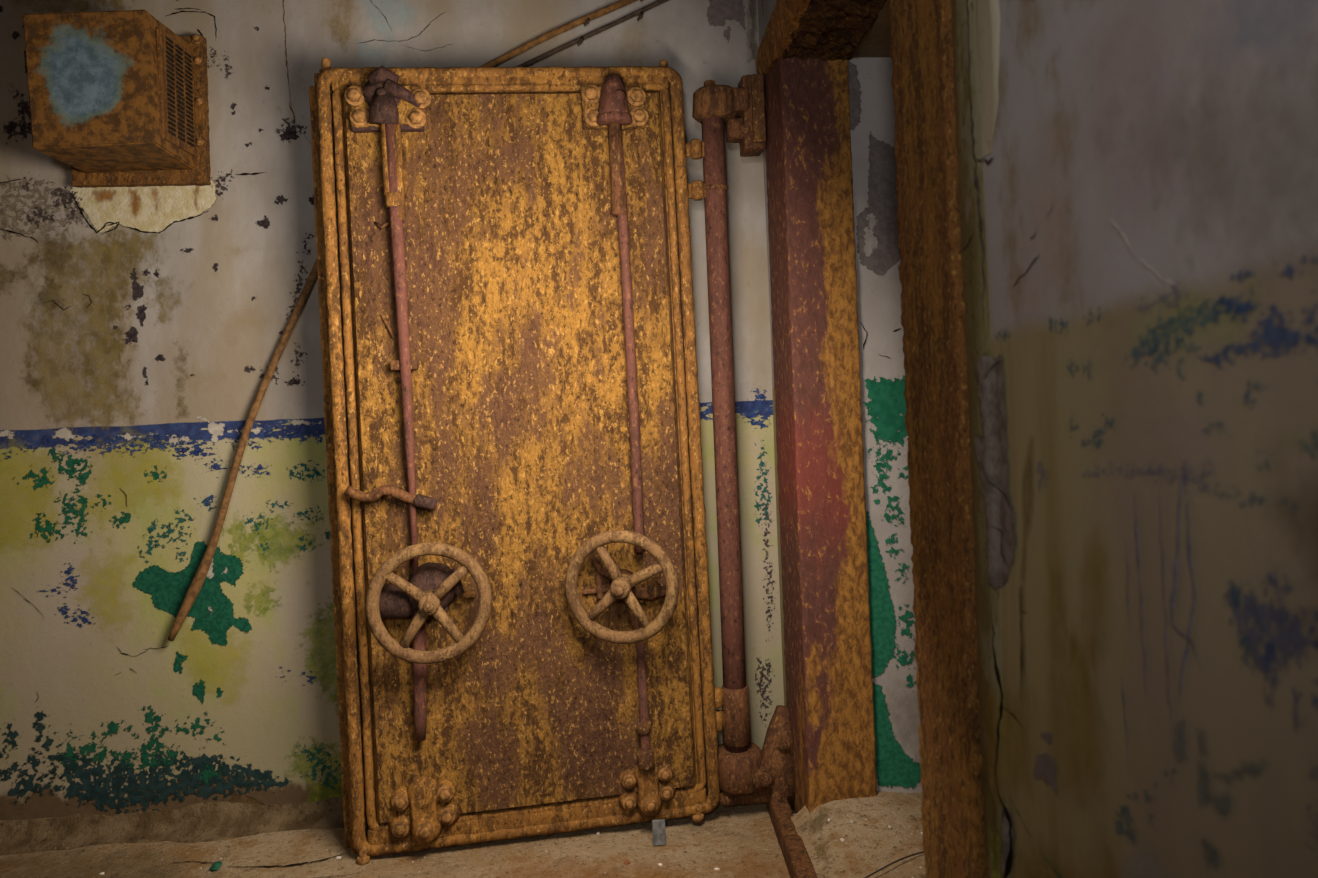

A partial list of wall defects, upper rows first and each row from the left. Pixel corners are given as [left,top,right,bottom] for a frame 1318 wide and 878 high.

peeling [707,0,746,43]
spalling [0,169,265,242]
peeling [255,194,288,229]
peeling [245,118,307,147]
peeling [848,60,901,275]
water stain [27,234,179,426]
water stain [244,233,317,386]
peeling [0,416,331,646]
spalling [974,354,1016,590]
peeling [0,680,292,816]
peeling [174,651,188,674]
crack [991,595,1031,878]